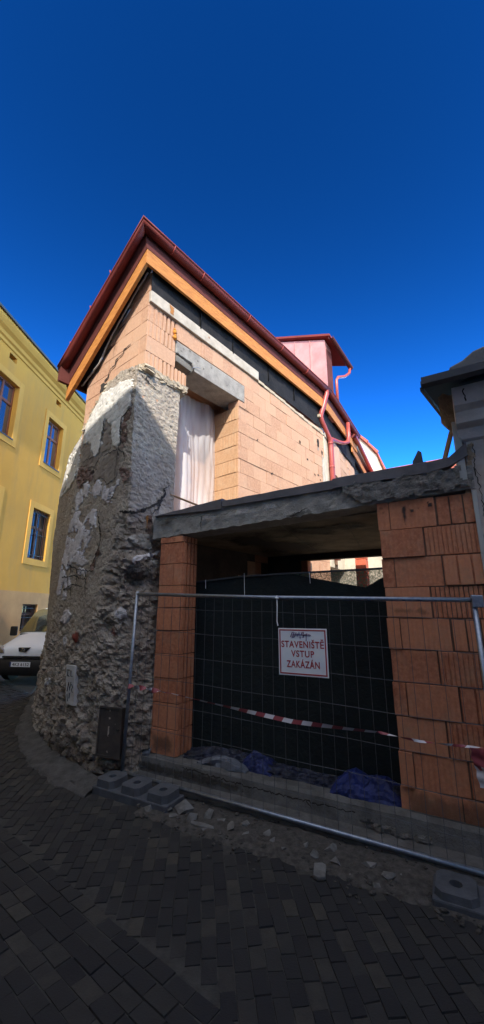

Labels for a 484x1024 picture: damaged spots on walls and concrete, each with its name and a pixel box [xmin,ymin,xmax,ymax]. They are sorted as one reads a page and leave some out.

flaking render [56,379,134,647]
crack [62,485,237,597]
spalling [342,443,476,503]